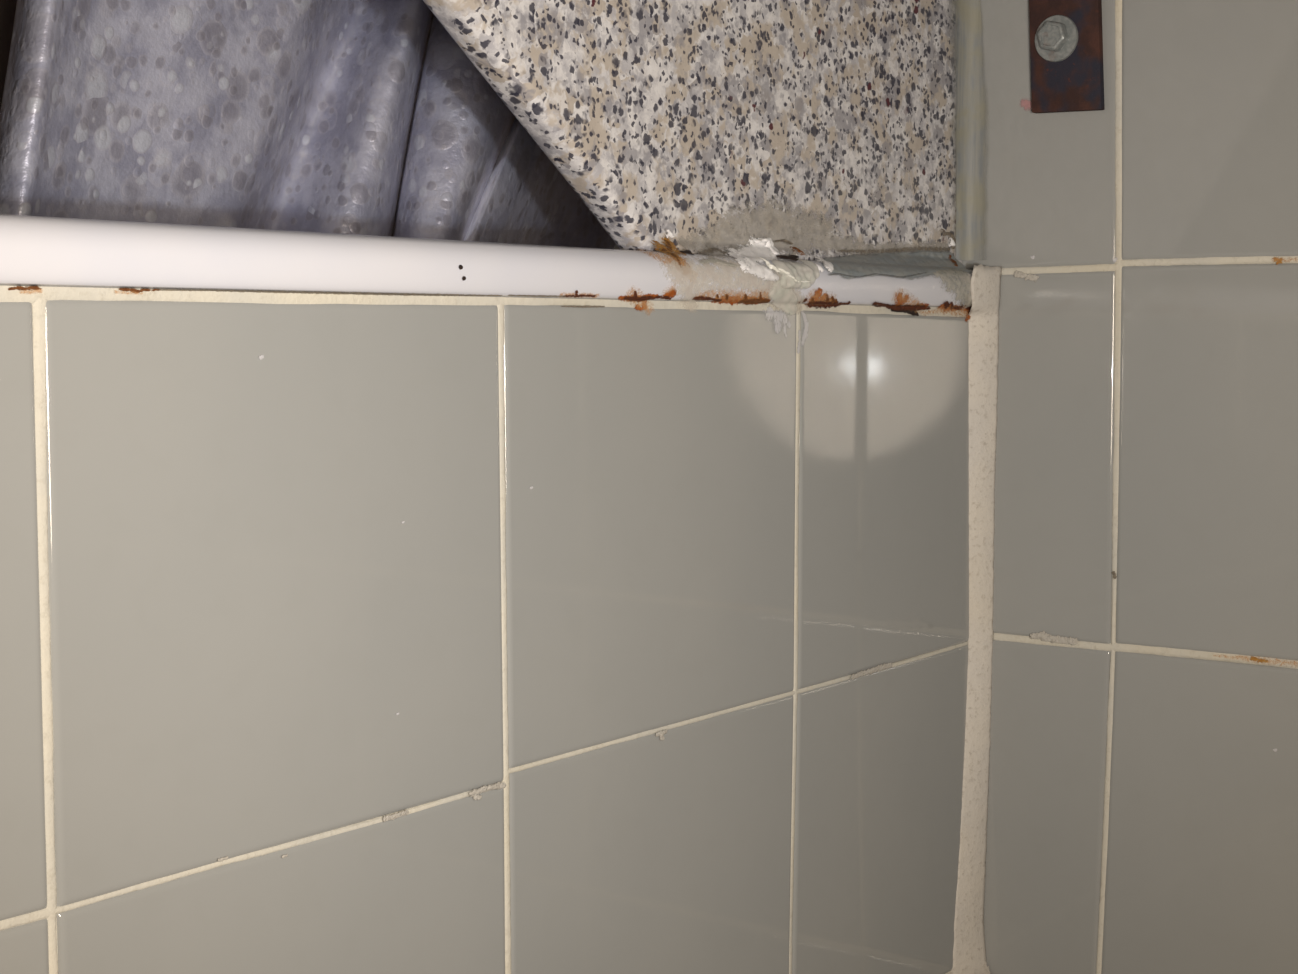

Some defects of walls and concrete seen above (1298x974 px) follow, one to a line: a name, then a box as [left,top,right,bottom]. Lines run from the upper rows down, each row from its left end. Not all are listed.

rust [651,237,690,268]
peeling [755,237,781,272]
peeling [815,257,834,273]
rust [618,289,677,312]
rust [692,292,771,305]
rust [799,287,851,309]
rust [872,292,972,322]